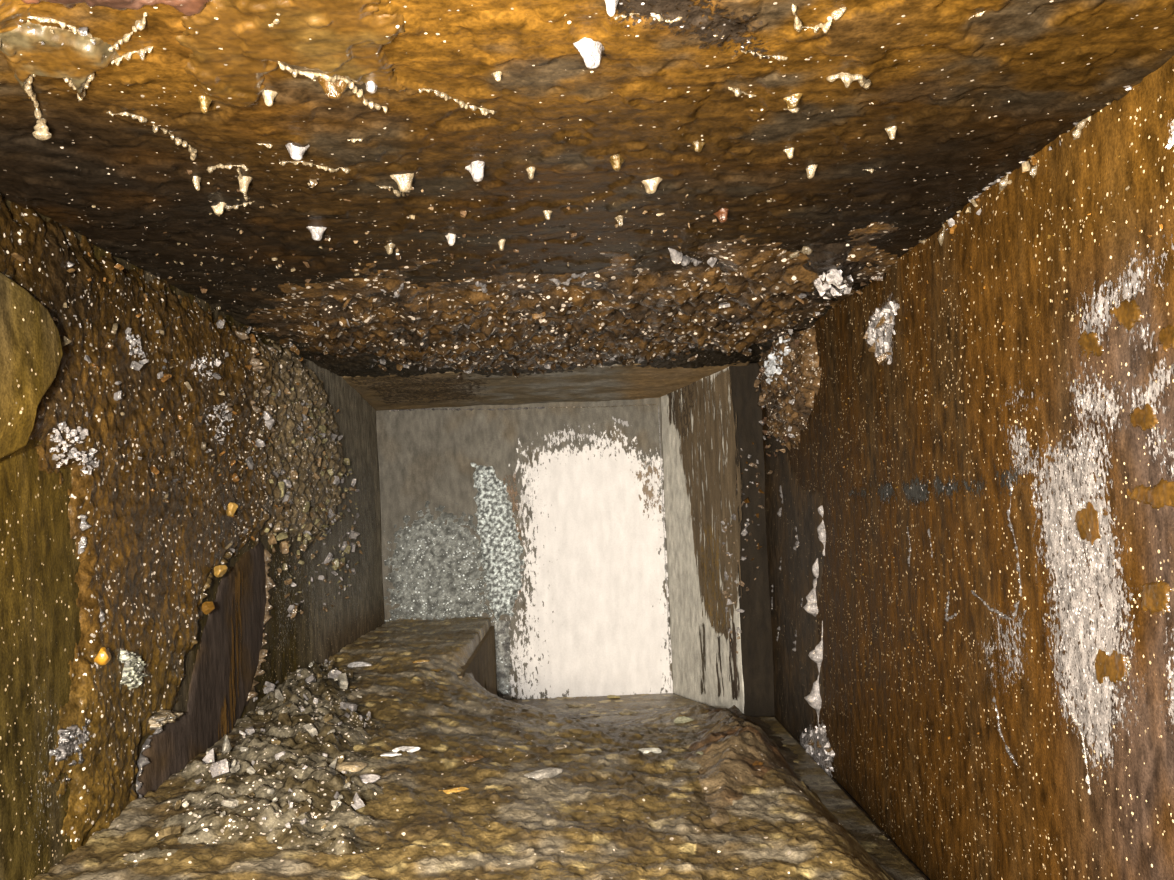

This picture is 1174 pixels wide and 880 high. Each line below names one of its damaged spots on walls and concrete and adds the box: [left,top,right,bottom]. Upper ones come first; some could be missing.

crack [919,86,1132,245]
spalling [789,242,866,299]
damp [1077,235,1174,344]
damp [0,193,914,865]
damp [1000,315,1174,778]
spalling [136,542,276,799]
damp [978,604,1029,692]